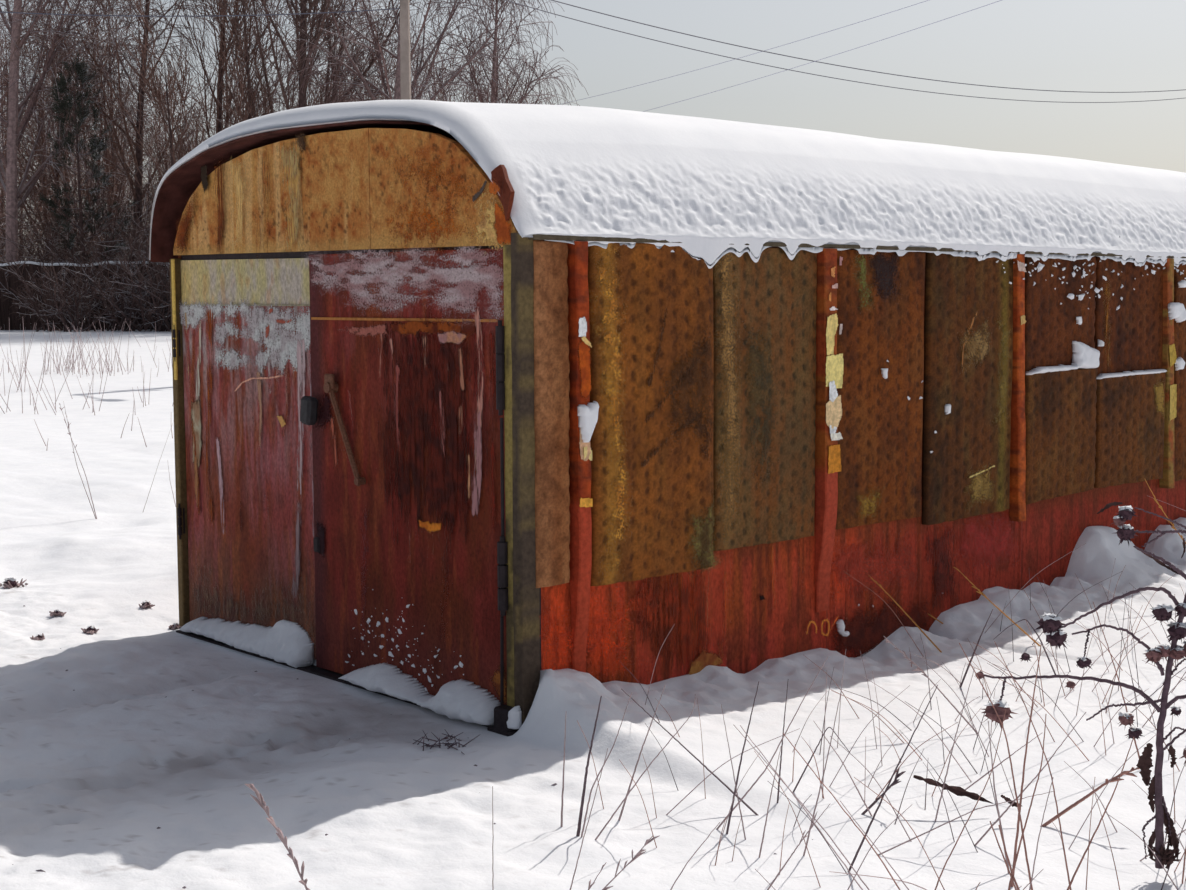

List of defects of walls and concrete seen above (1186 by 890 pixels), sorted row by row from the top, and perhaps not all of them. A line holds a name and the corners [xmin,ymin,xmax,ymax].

rust [175,192,195,252]
rust [213,163,225,252]
rust [488,180,511,246]
peeling [309,189,504,516]
peeling [578,317,592,348]
peeling [826,256,844,474]
rust [192,309,214,524]
peeling [179,299,314,597]
rust [378,313,488,540]
peeling [579,427,592,461]
peeling [579,498,593,508]
rust [833,597,929,657]